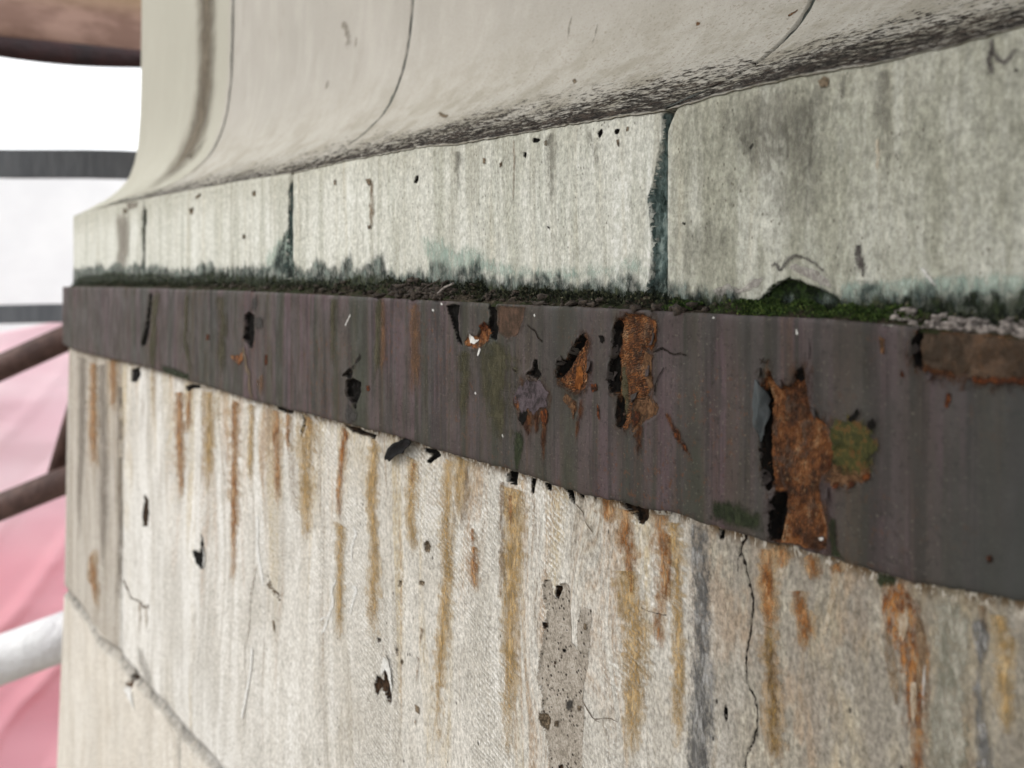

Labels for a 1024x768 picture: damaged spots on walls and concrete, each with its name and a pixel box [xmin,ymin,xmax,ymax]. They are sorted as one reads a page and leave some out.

corrosion [446,305,525,356]
corrosion [513,312,690,470]
corrosion [906,330,1024,392]
spalling [193,535,205,569]
corrosion [752,360,879,752]
spalling [374,649,404,702]
peeling [537,579,592,768]
leakage [687,524,713,768]
crack [737,535,758,767]